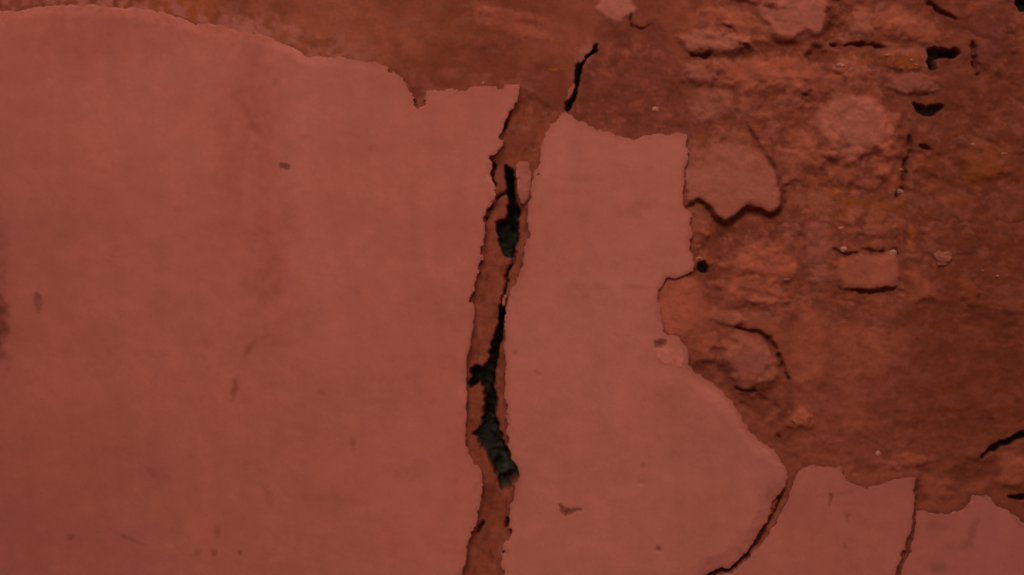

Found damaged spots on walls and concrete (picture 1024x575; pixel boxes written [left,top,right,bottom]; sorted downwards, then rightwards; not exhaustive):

flaking render [0,0,687,140]
crack [461,42,596,575]
flaking render [656,0,1024,523]
crack [706,475,795,575]
crack [895,480,925,575]